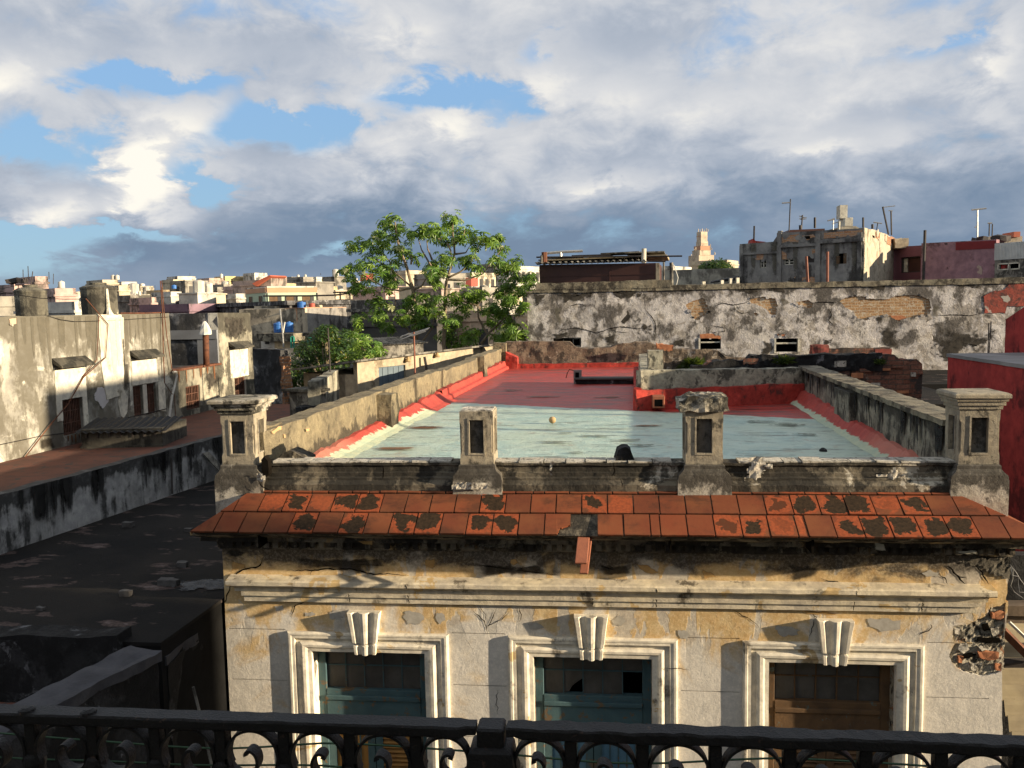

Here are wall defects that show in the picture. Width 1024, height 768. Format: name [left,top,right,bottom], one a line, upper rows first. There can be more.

crack [555,304,656,336]
flaking render [686,298,711,320]
flaking render [840,294,932,321]
peeling [983,283,1024,313]
damp [14,289,161,402]
damp [214,436,223,464]
damp [19,476,73,520]
damp [301,559,382,573]
damp [481,565,556,575]
damp [602,566,629,575]
crack [941,566,988,584]
flaking render [949,603,1005,675]